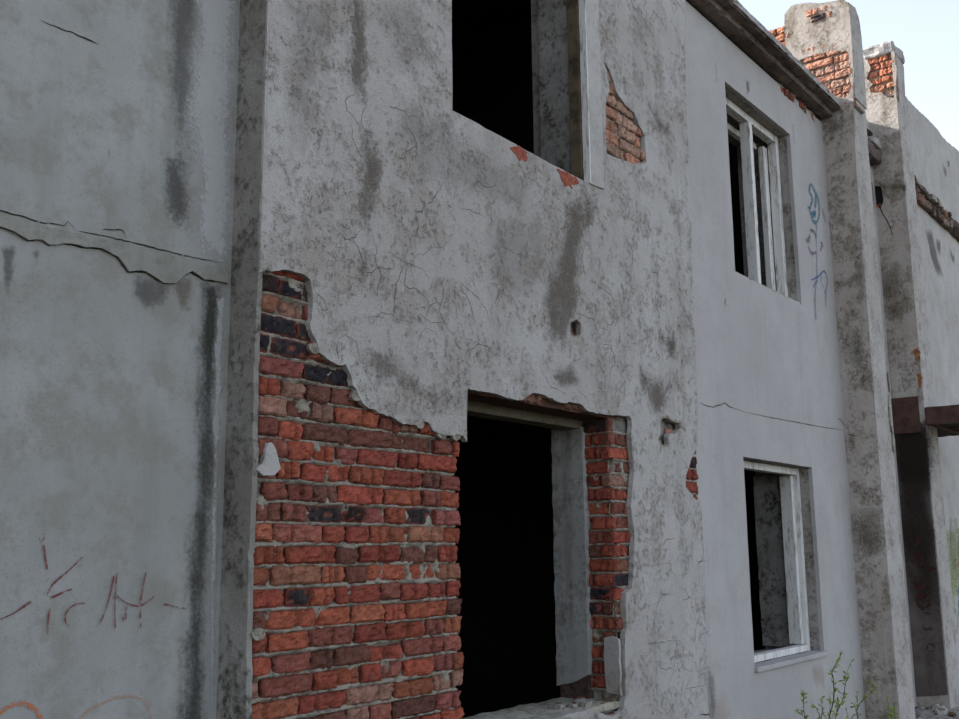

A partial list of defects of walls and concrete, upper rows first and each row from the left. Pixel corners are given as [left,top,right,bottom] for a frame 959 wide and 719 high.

crack [43,21,98,44]
damp [187,0,234,254]
damp [353,1,366,92]
spalling [606,71,645,164]
spalling [801,41,857,108]
spalling [868,53,900,103]
crack [0,210,228,264]
crack [333,185,521,351]
damp [548,202,596,336]
crack [698,402,856,436]
damp [180,287,224,719]
spalling [250,271,464,719]